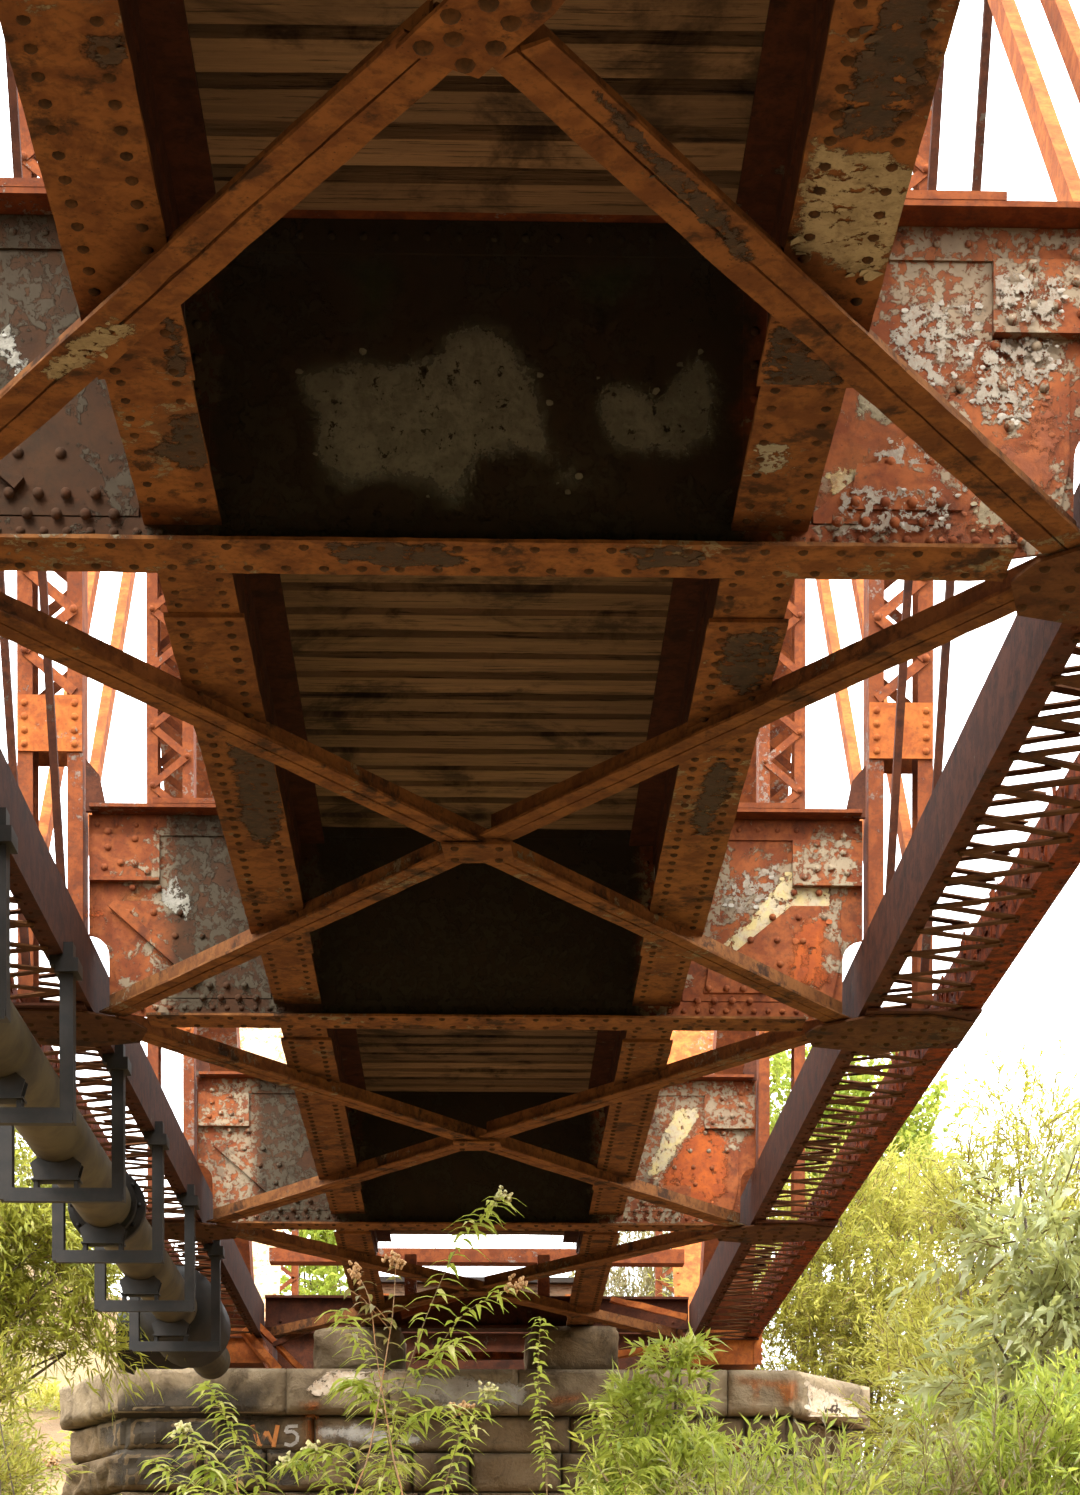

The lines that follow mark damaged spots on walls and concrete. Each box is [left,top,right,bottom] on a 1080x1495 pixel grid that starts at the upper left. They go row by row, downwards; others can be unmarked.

corrosion [833,0,939,142]
peeling [0,318,135,380]
peeling [887,270,1069,425]
peeling [856,395,930,464]
peeling [825,467,1008,538]
peeling [161,876,192,922]
peeling [721,863,830,951]
peeling [647,1108,699,1180]